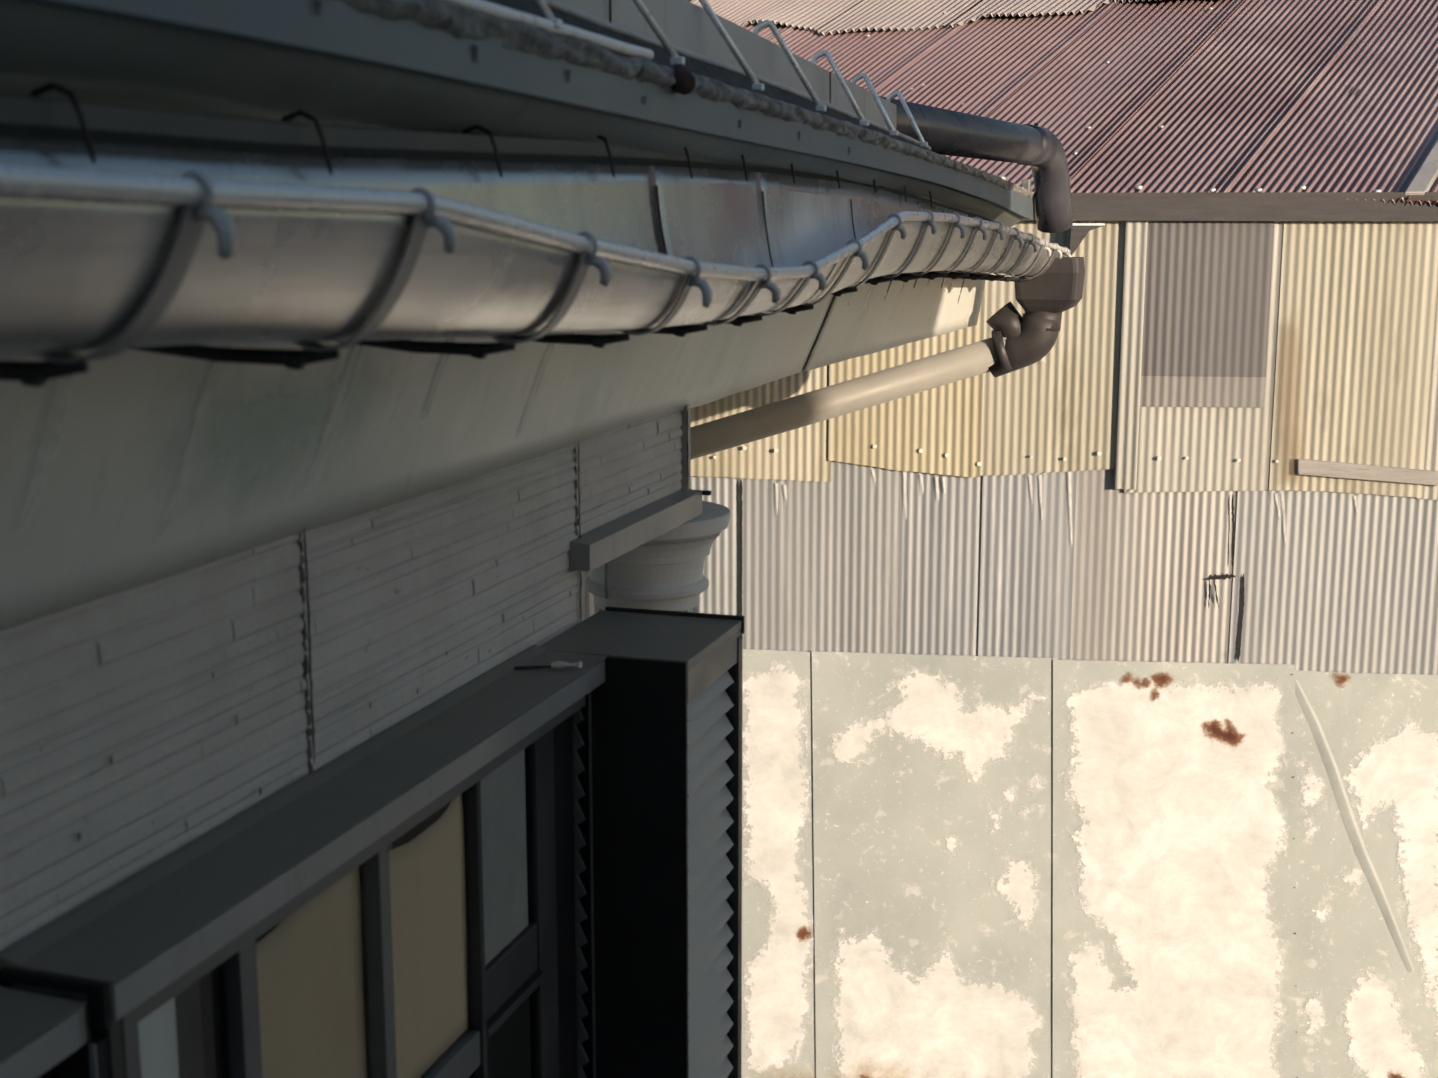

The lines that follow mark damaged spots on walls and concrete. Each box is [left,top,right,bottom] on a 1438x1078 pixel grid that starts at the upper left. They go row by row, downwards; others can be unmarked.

damp [827,668,1047,784]
rust [1122,673,1173,700]
rust [1203,720,1244,747]
damp [989,774,1044,832]
damp [742,662,815,1073]
rust [797,926,811,940]
damp [990,861,1041,928]
damp [1065,678,1325,1078]
damp [1312,903,1331,922]
damp [1342,718,1438,1015]
damp [832,928,1043,1078]
damp [1343,970,1428,1078]